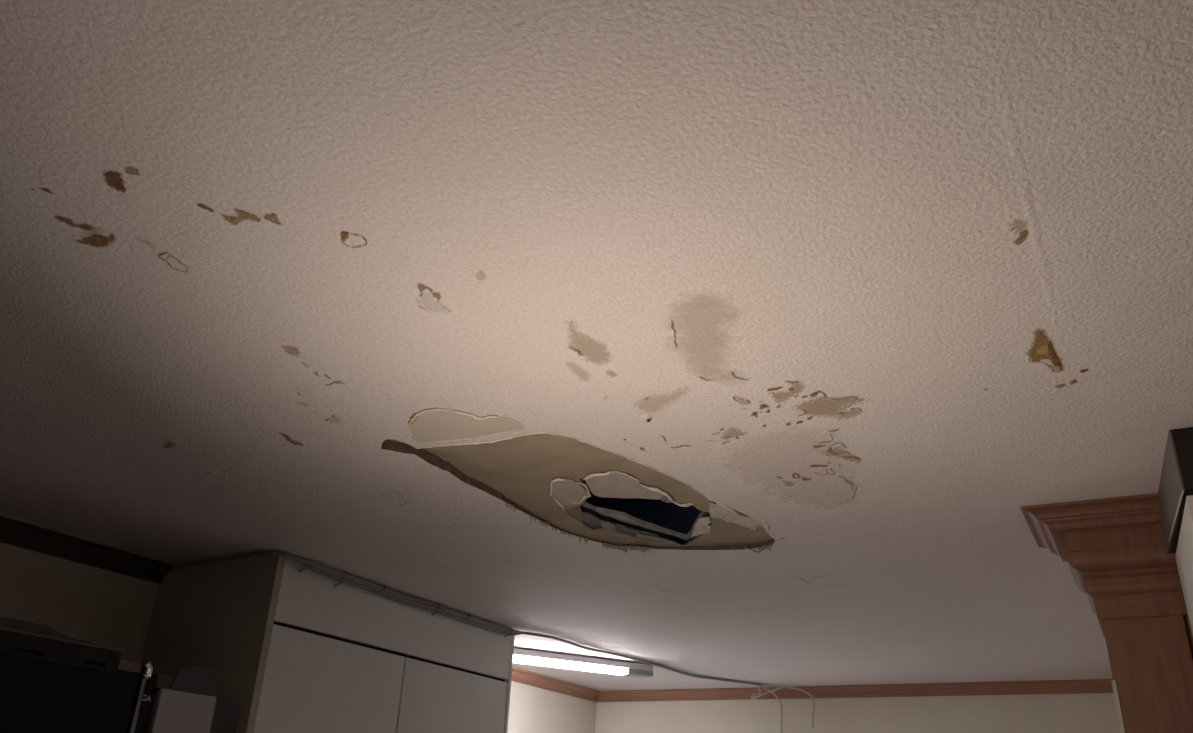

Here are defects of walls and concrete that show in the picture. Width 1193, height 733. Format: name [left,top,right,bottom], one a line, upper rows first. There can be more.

spalling [1026,329,1062,373]
peeling [733,381,862,500]
flaking render [552,472,664,506]